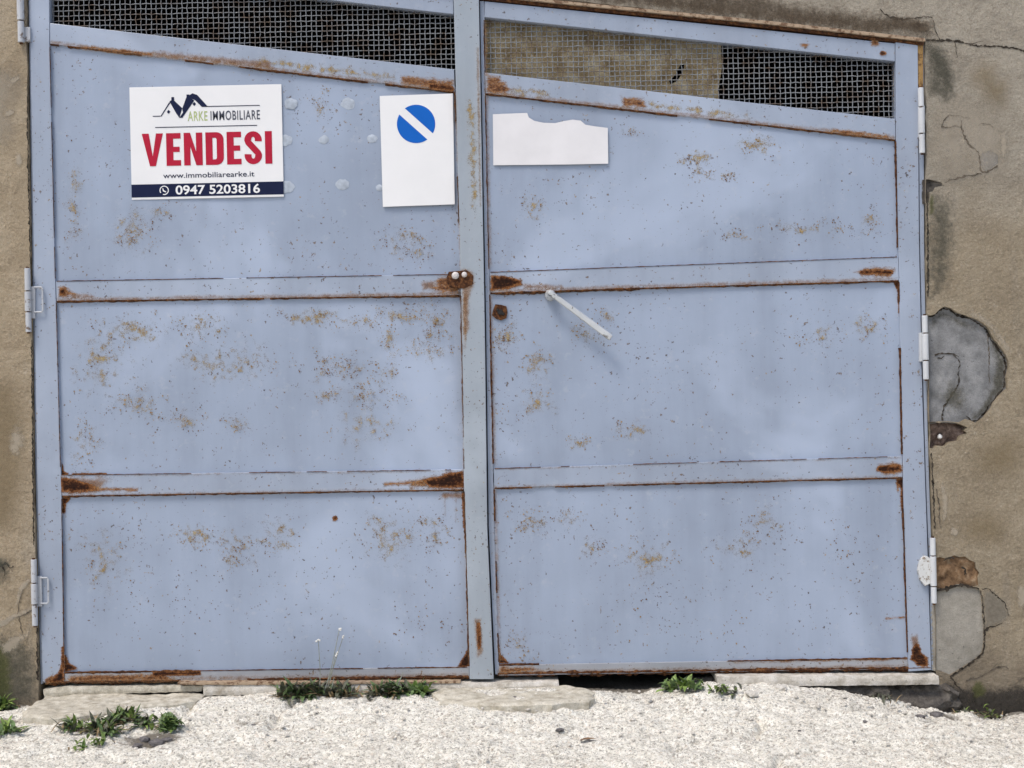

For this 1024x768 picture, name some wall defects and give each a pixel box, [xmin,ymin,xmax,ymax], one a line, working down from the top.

crack [880,9,1024,54]
corrosion [45,381,482,686]
corrosion [49,20,900,469]
corrosion [493,348,931,677]
spalling [926,307,1009,448]
spalling [930,556,1007,674]